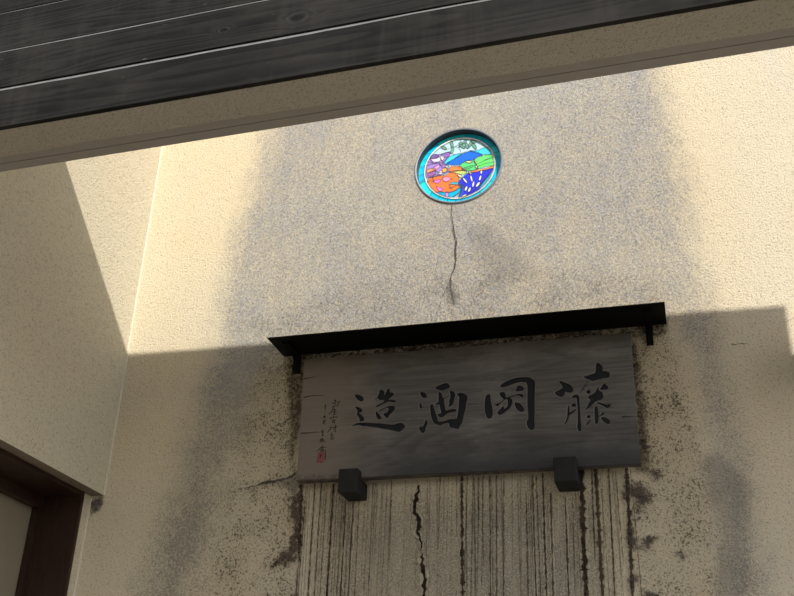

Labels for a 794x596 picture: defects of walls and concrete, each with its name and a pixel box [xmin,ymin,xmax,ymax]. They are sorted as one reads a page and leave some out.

crack [449,208,457,303]
water stain [148,68,767,596]
crack [239,473,295,489]
crack [411,485,429,596]